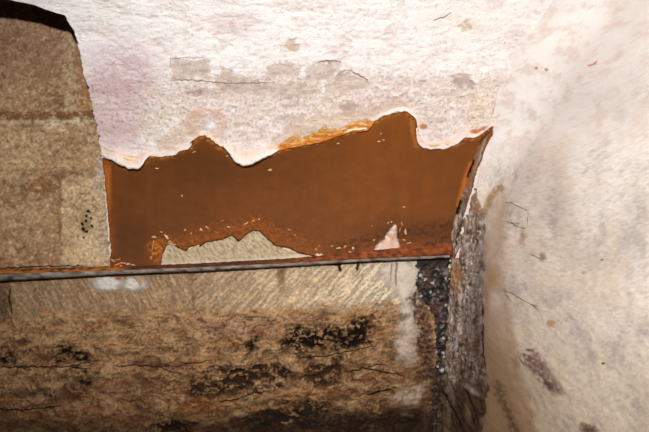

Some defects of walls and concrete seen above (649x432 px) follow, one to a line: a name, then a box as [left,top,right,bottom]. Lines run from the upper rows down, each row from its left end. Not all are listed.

peeling [373,107,483,150]
peeling [100,131,280,170]
corrosion [0,111,493,280]
spalling [161,230,327,274]
water stain [380,130,561,432]
crack [2,361,93,371]
crack [118,360,209,374]
crack [303,346,374,358]
crack [348,364,401,395]